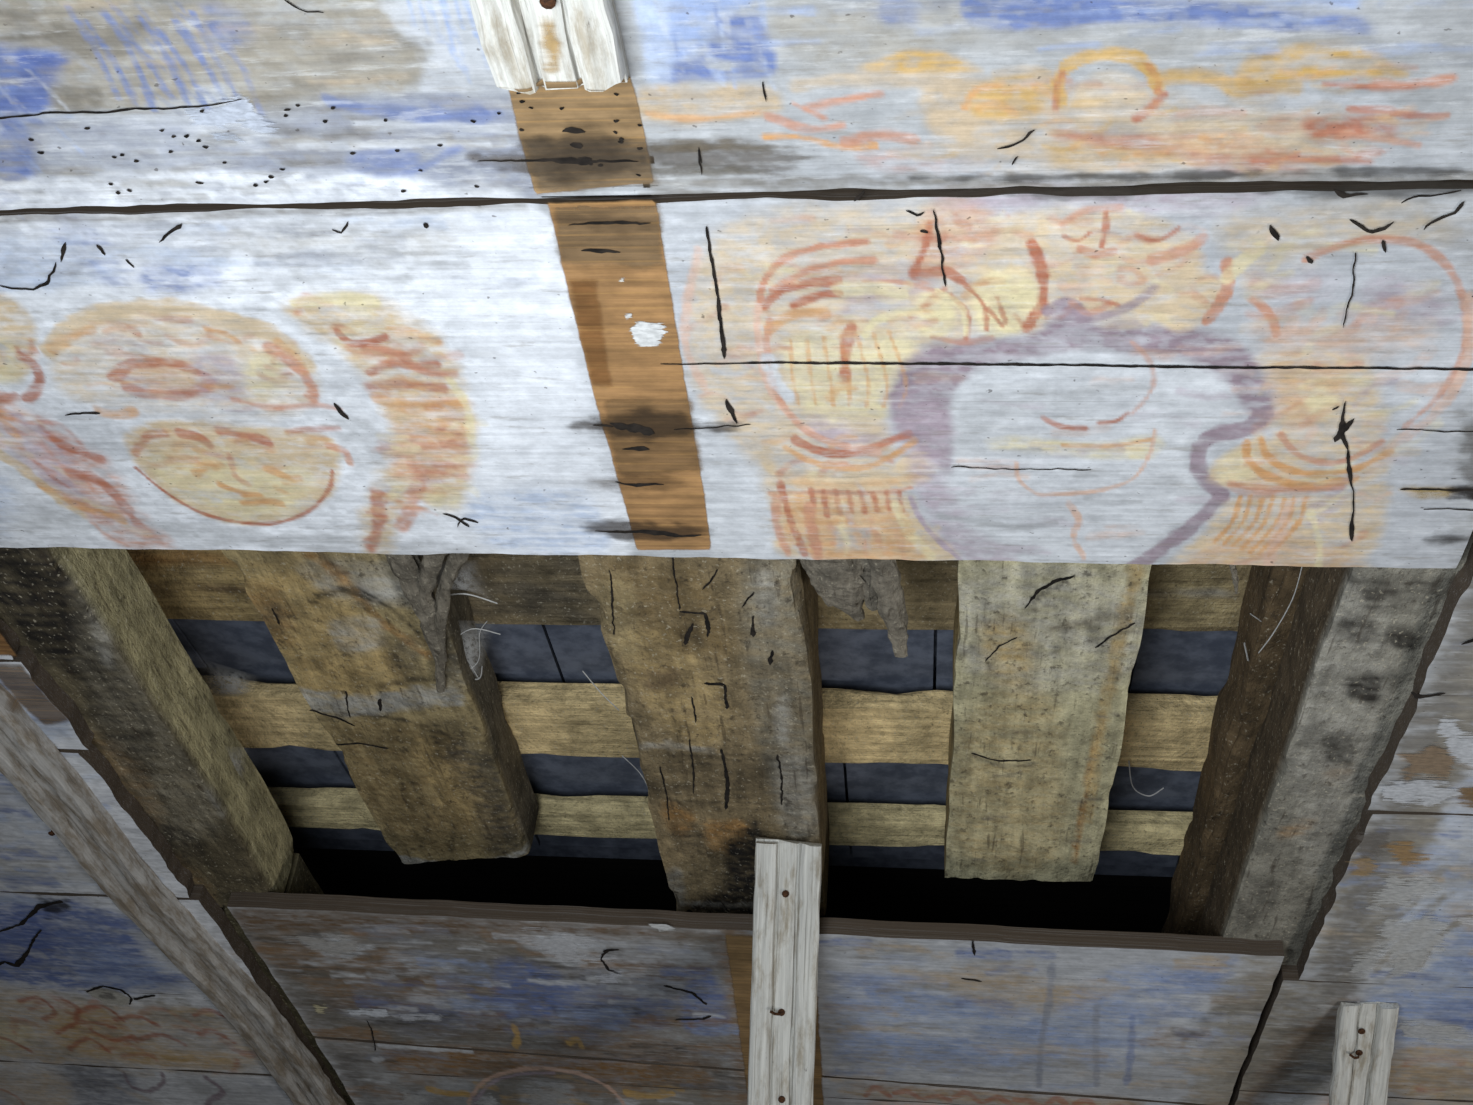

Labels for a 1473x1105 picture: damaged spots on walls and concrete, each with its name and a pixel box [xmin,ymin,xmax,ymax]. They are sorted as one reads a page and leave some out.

crack [696,147,704,176]
crack [0,224,182,291]
crack [1334,189,1464,327]
peeling [572,282,699,474]
crack [593,225,1473,541]
crack [1411,691,1445,699]
crack [0,900,63,967]